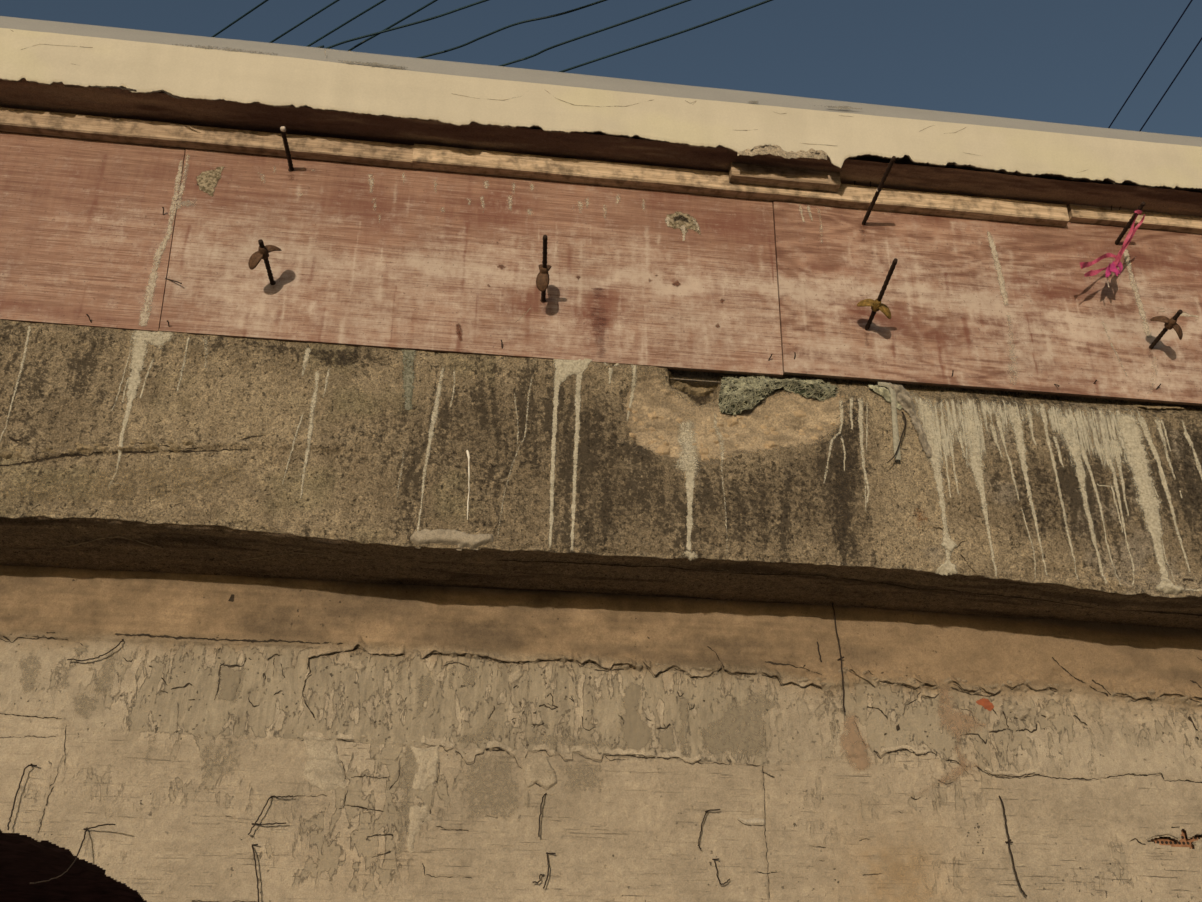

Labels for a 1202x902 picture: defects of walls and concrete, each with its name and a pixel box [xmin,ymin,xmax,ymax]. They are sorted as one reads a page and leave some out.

damp [109,155,194,485]
crack [0,435,263,466]
damp [453,362,914,589]
spalling [620,367,846,477]
damp [911,396,1202,610]
crack [0,713,66,832]
crack [115,633,344,645]
flaking render [214,658,259,707]
flaking render [301,635,701,853]
flaking render [421,642,826,690]
crack [898,709,1202,814]
flaking render [1110,680,1202,707]